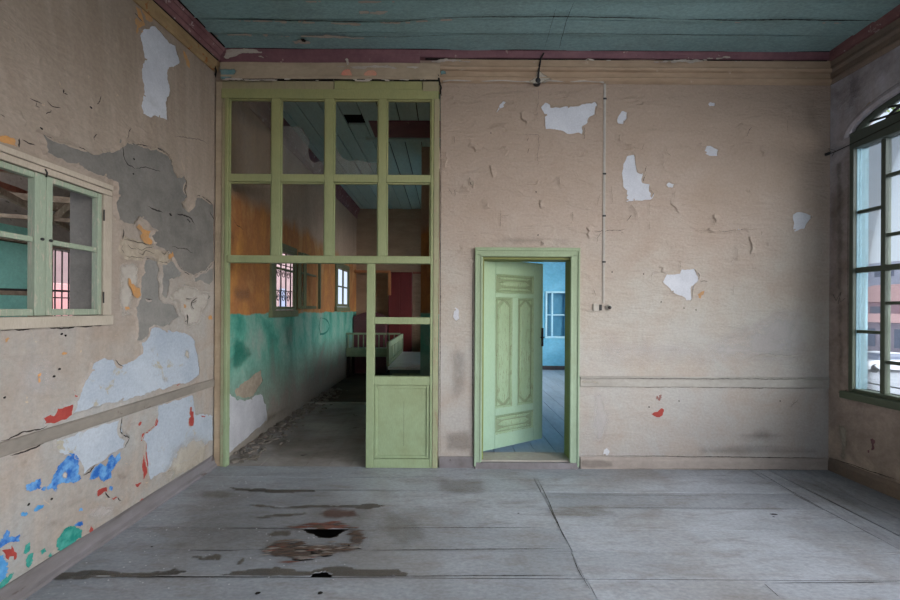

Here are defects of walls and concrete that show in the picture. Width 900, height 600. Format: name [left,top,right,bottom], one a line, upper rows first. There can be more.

peeling [135,7,190,123]
peeling [540,100,598,135]
peeling [616,110,628,126]
peeling [621,154,655,203]
peeling [791,211,815,233]
peeling [662,268,701,302]
flaking render [21,127,215,517]
peeling [229,368,268,455]
peeling [0,508,94,589]